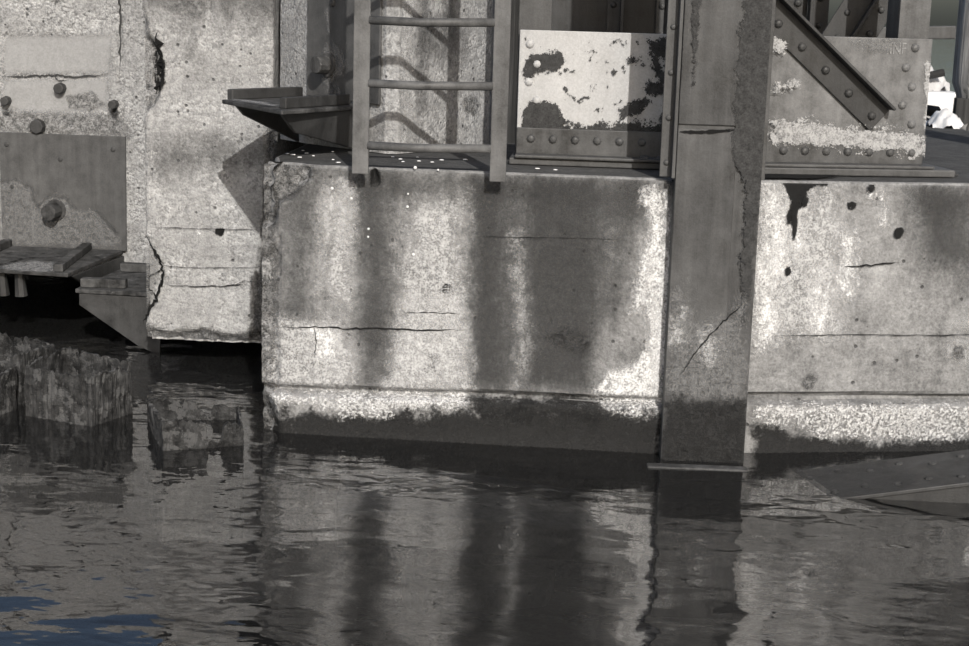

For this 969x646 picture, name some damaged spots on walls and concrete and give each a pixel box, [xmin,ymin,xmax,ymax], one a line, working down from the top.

crack [2,0,122,82]
spalling [0,92,134,140]
crack [154,33,164,94]
peeling [520,36,666,132]
peeling [0,181,121,247]
crack [144,227,259,320]
leakage [319,178,356,302]
leakage [382,179,671,402]
leakage [752,183,860,350]
leakage [265,316,355,394]
crack [275,312,461,356]
crack [679,301,745,377]